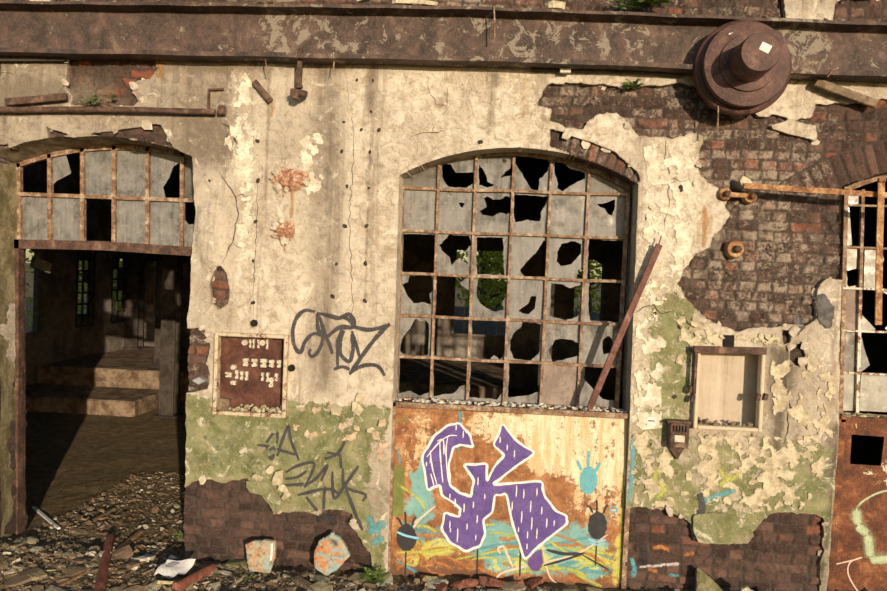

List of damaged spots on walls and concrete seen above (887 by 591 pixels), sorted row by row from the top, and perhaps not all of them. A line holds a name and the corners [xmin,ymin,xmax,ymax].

spalling [428,0,783,18]
spalling [833,0,887,22]
spalling [96,120,173,149]
crack [346,78,356,313]
crack [219,172,258,307]
spalling [210,264,230,309]
spalling [538,83,887,591]
peeling [296,393,388,461]
spalling [183,422,373,573]